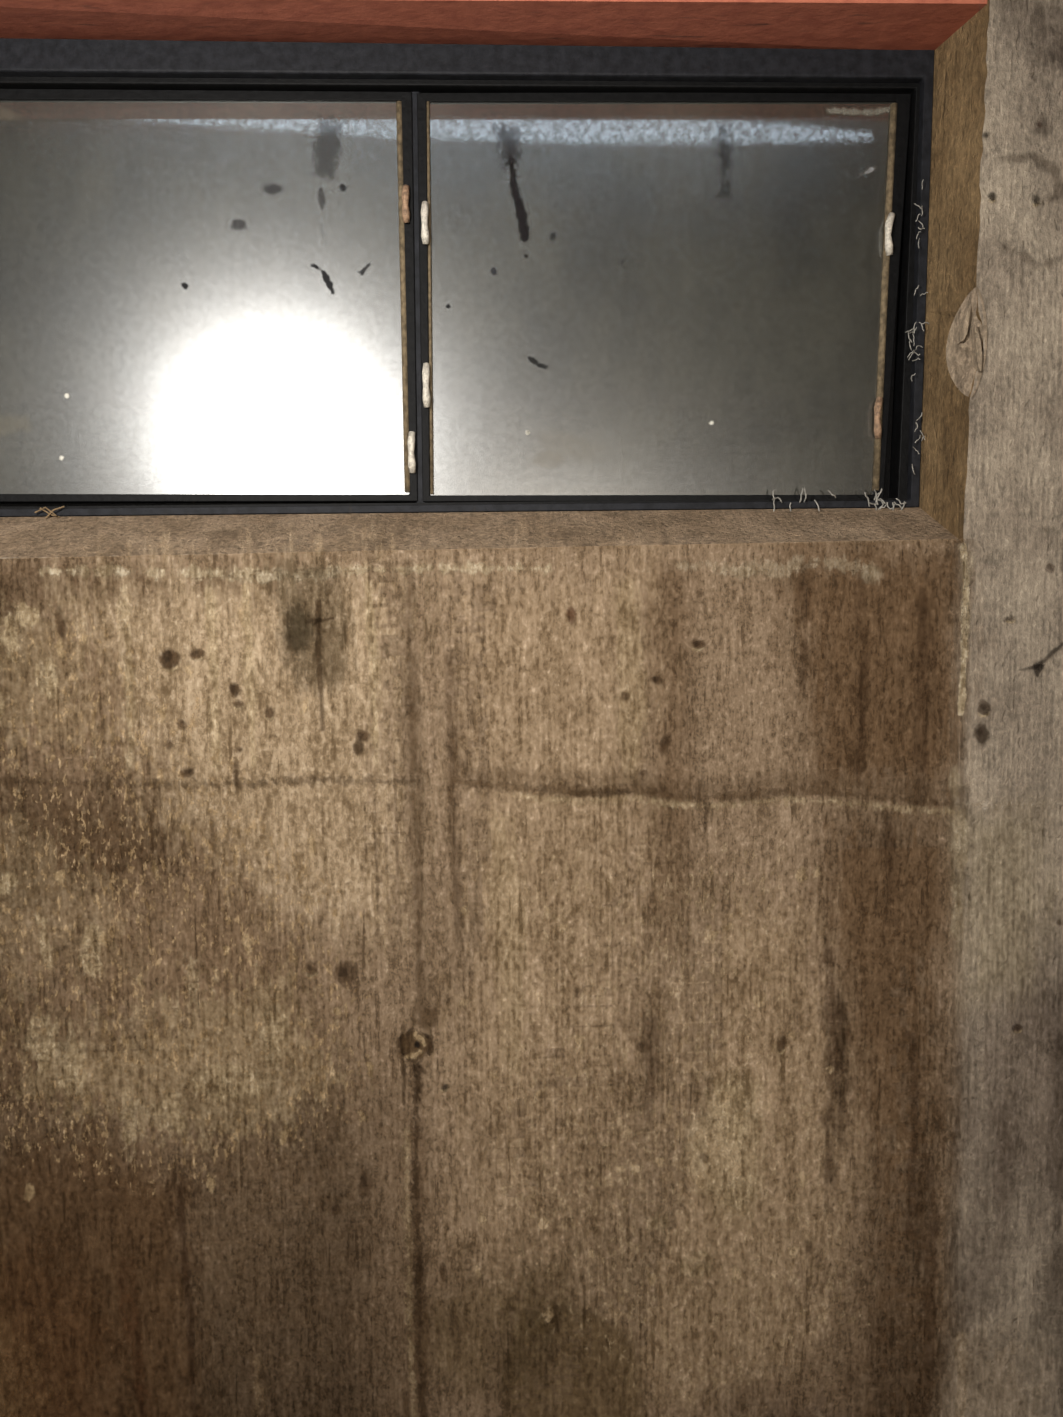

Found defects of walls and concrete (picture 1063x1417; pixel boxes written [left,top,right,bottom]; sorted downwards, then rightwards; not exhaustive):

water stain [0,539,958,1417]
crack [1028,643,1063,677]